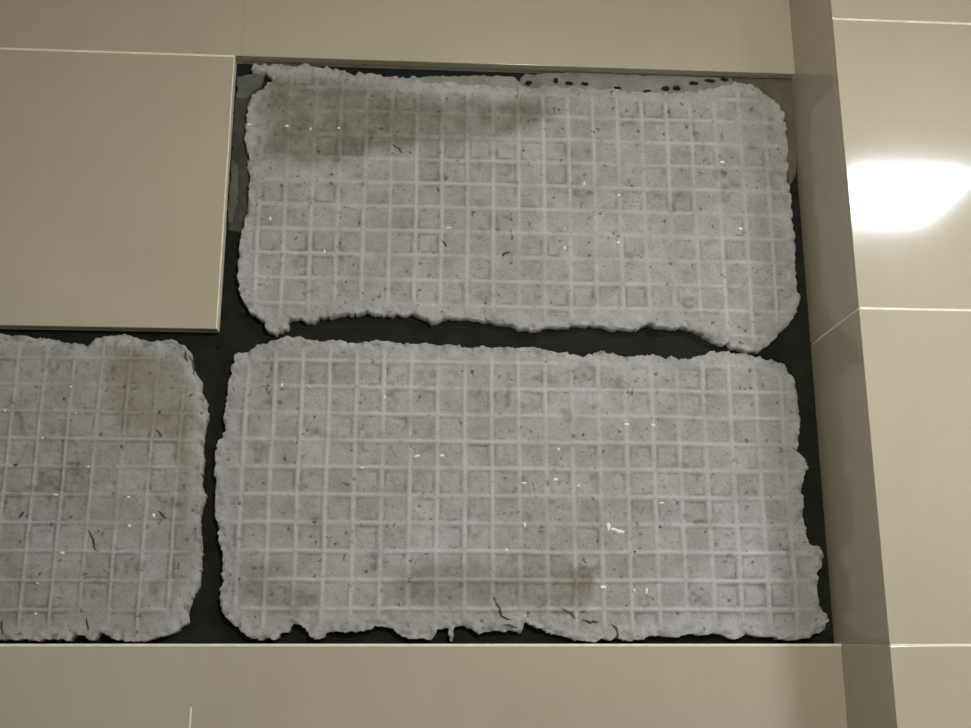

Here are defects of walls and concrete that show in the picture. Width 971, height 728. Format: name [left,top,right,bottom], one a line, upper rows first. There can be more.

spalling [0,63,829,642]